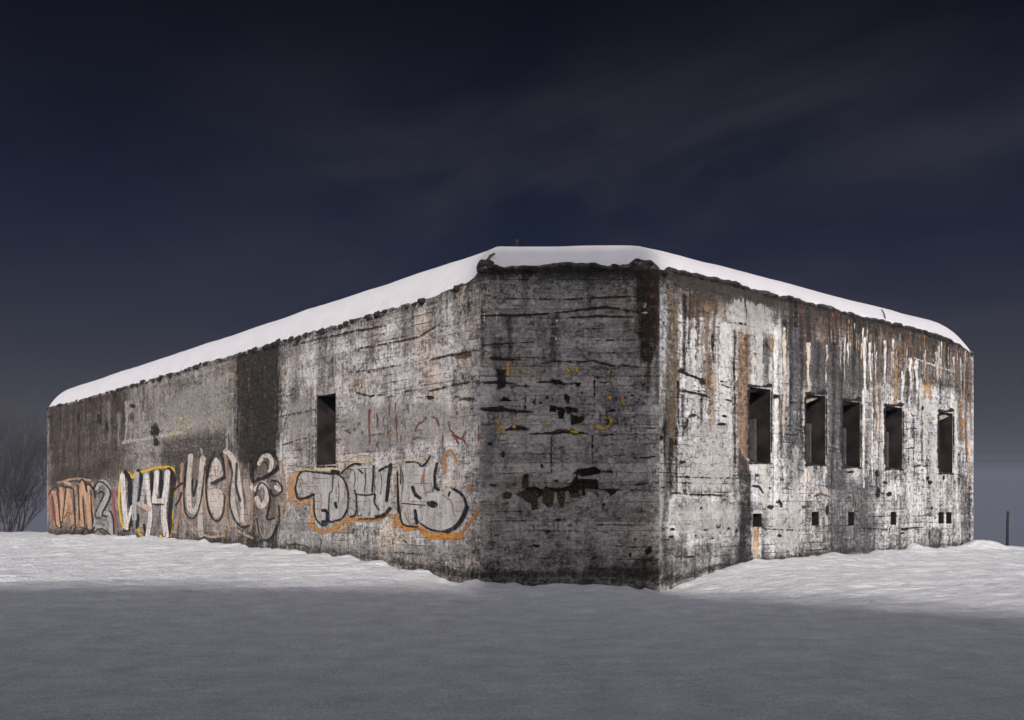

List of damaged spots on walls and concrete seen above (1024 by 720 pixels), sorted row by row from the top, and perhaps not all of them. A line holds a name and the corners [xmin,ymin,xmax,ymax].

leakage [49,345,300,550]
spalling [459,369,511,412]
spalling [489,467,619,534]
spalling [533,379,585,435]
rust [663,284,726,505]
leakage [429,263,971,586]
rust [737,317,773,476]
rust [810,314,972,488]